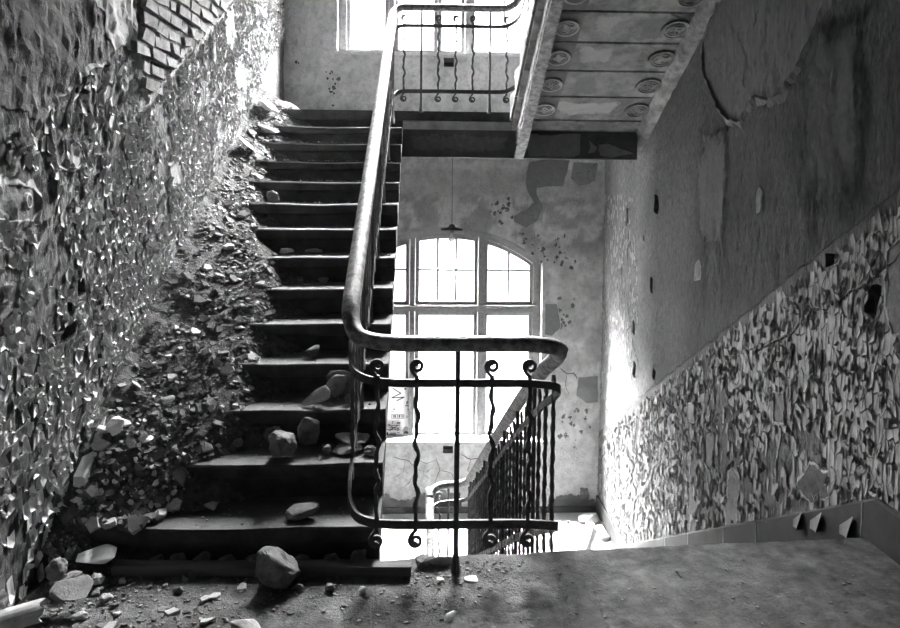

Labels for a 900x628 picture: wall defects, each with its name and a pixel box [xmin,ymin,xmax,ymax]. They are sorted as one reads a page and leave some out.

peeling [0,0,286,610]
flaking render [489,132,635,270]
peeling [557,189,900,544]